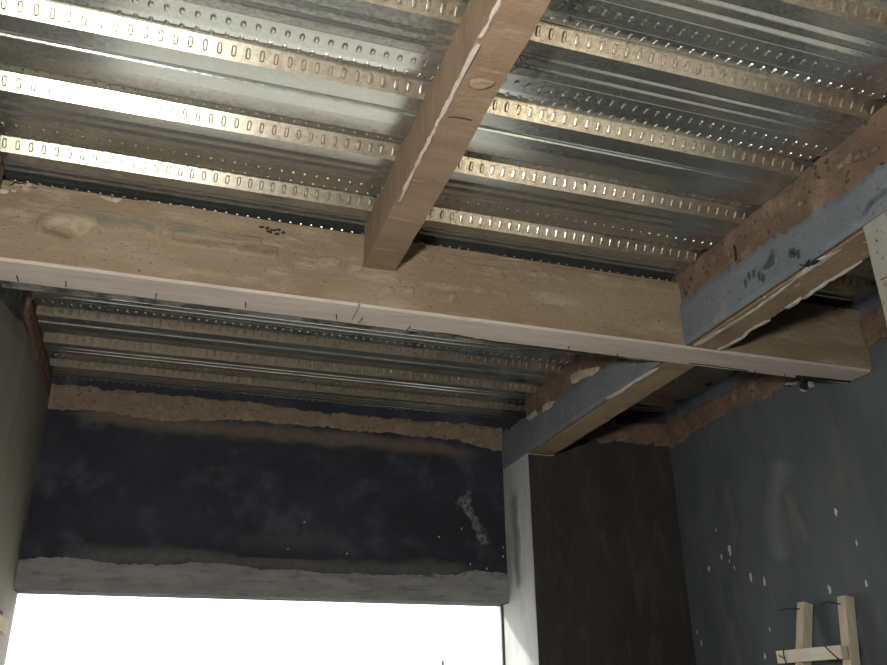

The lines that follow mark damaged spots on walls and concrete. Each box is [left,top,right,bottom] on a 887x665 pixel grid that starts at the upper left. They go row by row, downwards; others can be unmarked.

peeling [694,249,842,346]
peeling [785,260,863,309]
peeling [718,319,771,351]
peeling [606,367,659,400]